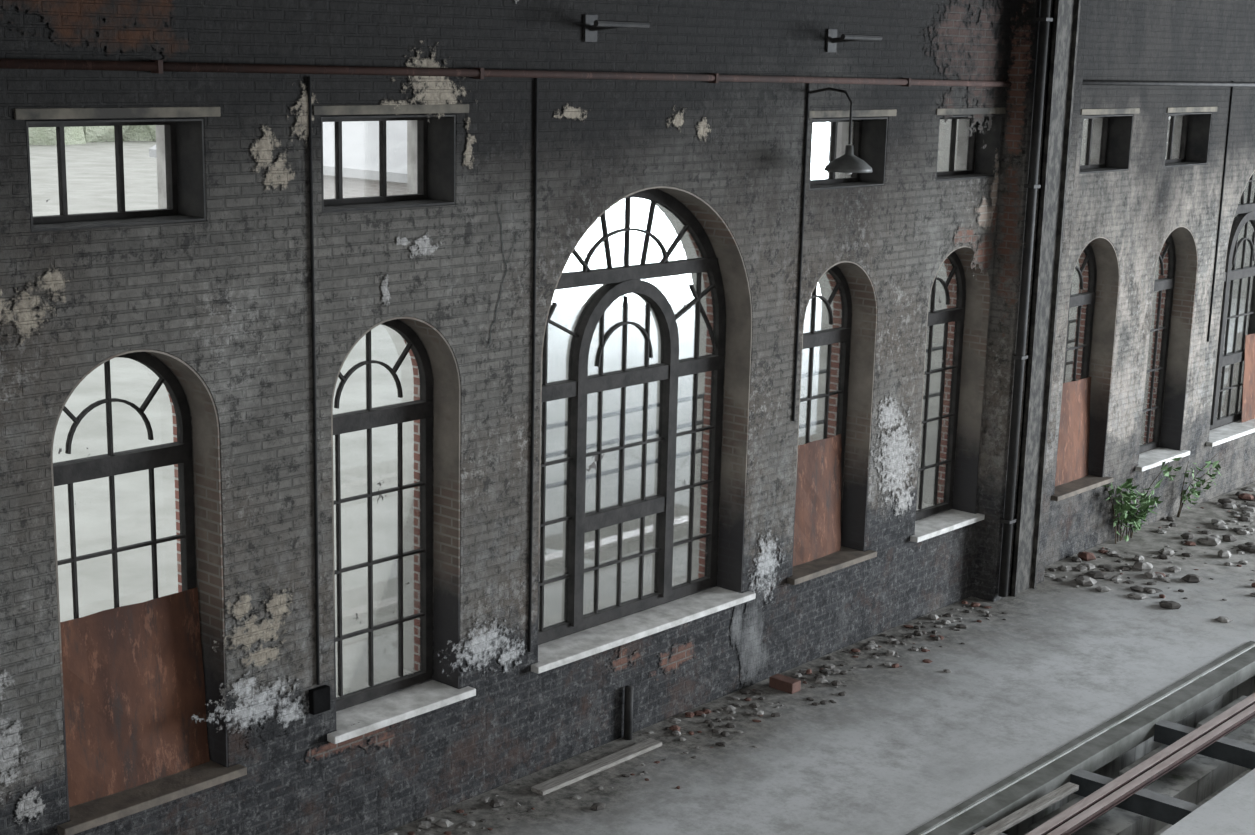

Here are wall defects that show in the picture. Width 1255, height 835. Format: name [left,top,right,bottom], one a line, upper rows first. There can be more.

spalling [249,80,319,194]
spalling [380,40,478,169]
flaking render [0,265,70,348]
rust [1055,377,1091,486]
rust [1241,333,1255,423]
rust [793,434,842,566]
rust [60,587,210,807]
peeling [219,682,240,714]
peeling [240,715,292,749]